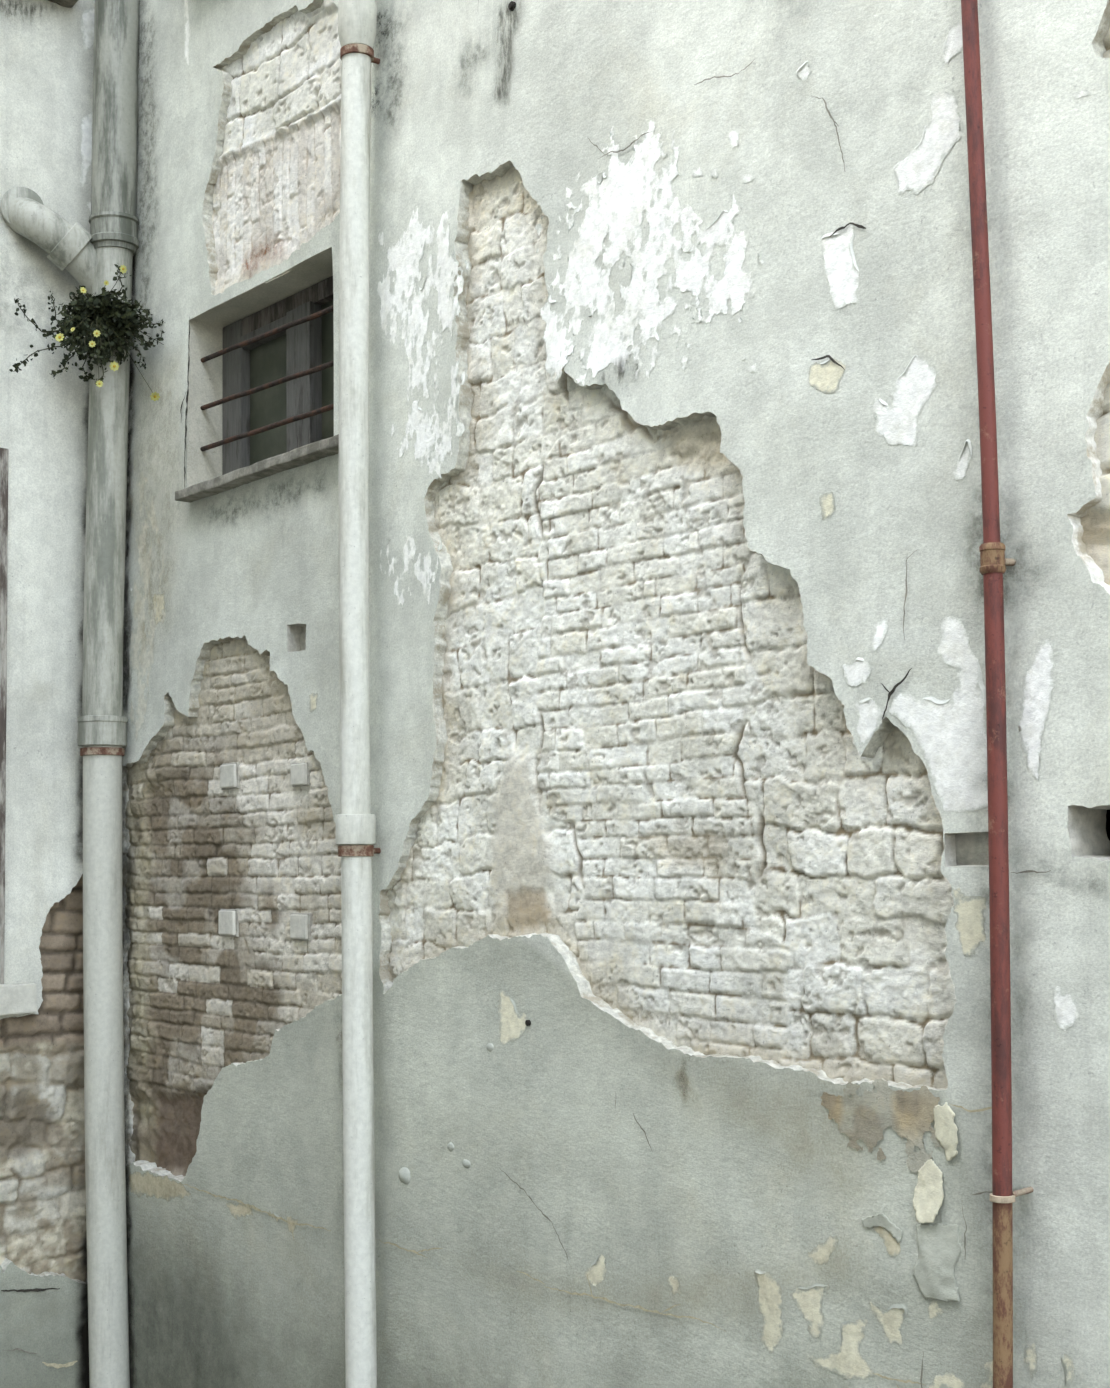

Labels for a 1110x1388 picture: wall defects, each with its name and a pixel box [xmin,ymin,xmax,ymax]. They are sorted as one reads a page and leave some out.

flaking render [202,0,342,309]
damp [497,4,518,97]
flaking render [1067,362,1110,594]
flaking render [122,445,342,1202]
flaking render [377,120,988,1319]
flaking render [0,874,86,1283]
crack [501,1170,726,1332]
peeling [754,1269,908,1380]